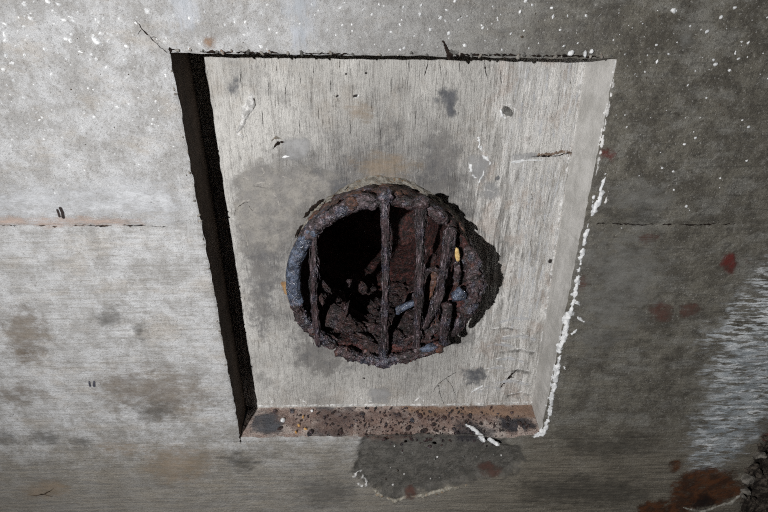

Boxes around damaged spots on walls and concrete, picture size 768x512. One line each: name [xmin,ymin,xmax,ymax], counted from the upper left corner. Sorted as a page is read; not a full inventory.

water stain [591,60,616,216]
rust [402,405,535,418]
water stain [500,225,654,438]
rust [638,461,741,512]
water stain [689,267,768,468]